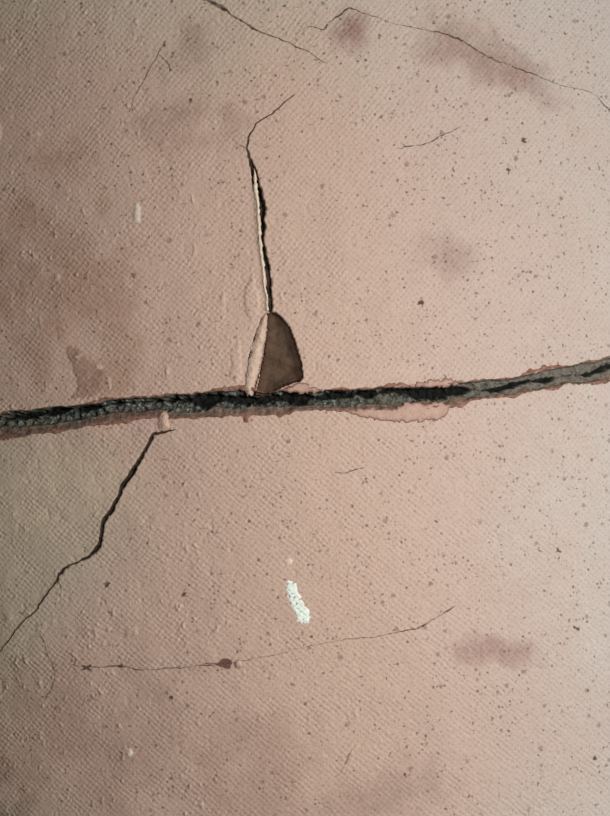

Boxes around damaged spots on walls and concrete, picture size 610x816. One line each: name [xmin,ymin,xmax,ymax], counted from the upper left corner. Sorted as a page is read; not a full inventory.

crack [205,0,610,110]
crack [236,94,295,312]
spalling [245,312,304,397]
crack [0,356,610,652]
crack [41,636,286,699]